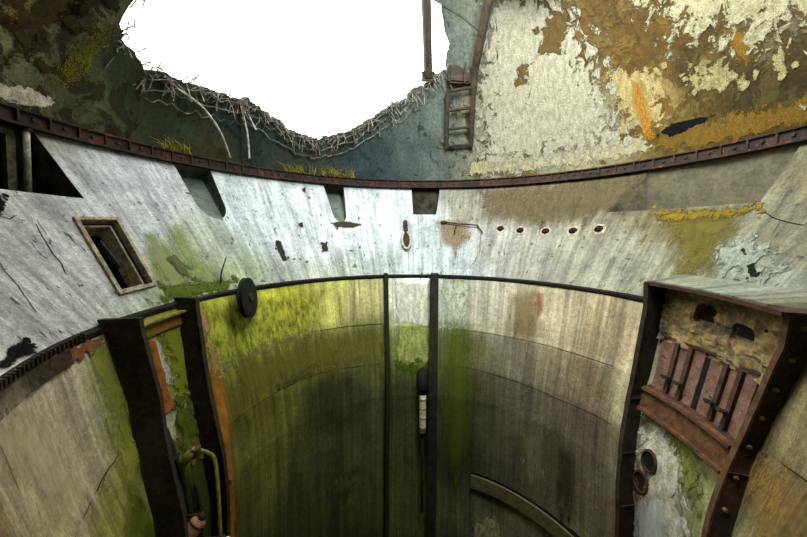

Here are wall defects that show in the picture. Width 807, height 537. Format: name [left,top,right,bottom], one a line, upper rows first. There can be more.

spalling [0,0,453,159]
peeling [463,0,807,179]
rust [632,83,807,153]
rust [440,221,470,259]
spalling [0,337,39,367]
leakage [236,313,385,424]
spalling [657,289,783,385]